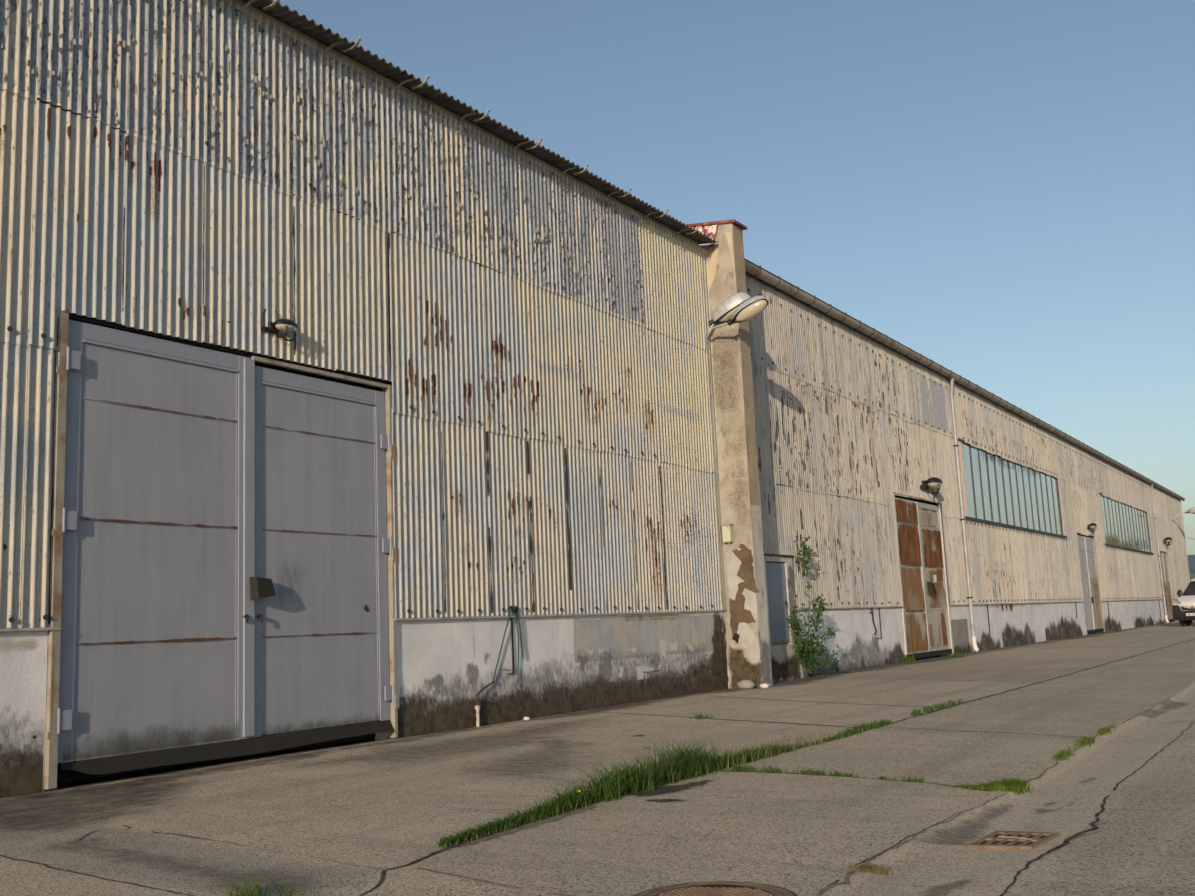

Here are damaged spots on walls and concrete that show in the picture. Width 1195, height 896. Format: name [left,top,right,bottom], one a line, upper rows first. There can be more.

corrosion [91,124,166,222]
peeling [0,0,645,324]
corrosion [178,298,230,345]
corrosion [405,300,452,425]
corrosion [464,333,540,428]
corrosion [566,356,655,443]
corrosion [645,516,664,602]
peeling [574,544,761,680]
leakage [347,566,1165,748]
corrosion [895,499,948,652]
leakage [0,726,326,828]
crack [816,696,1195,896]